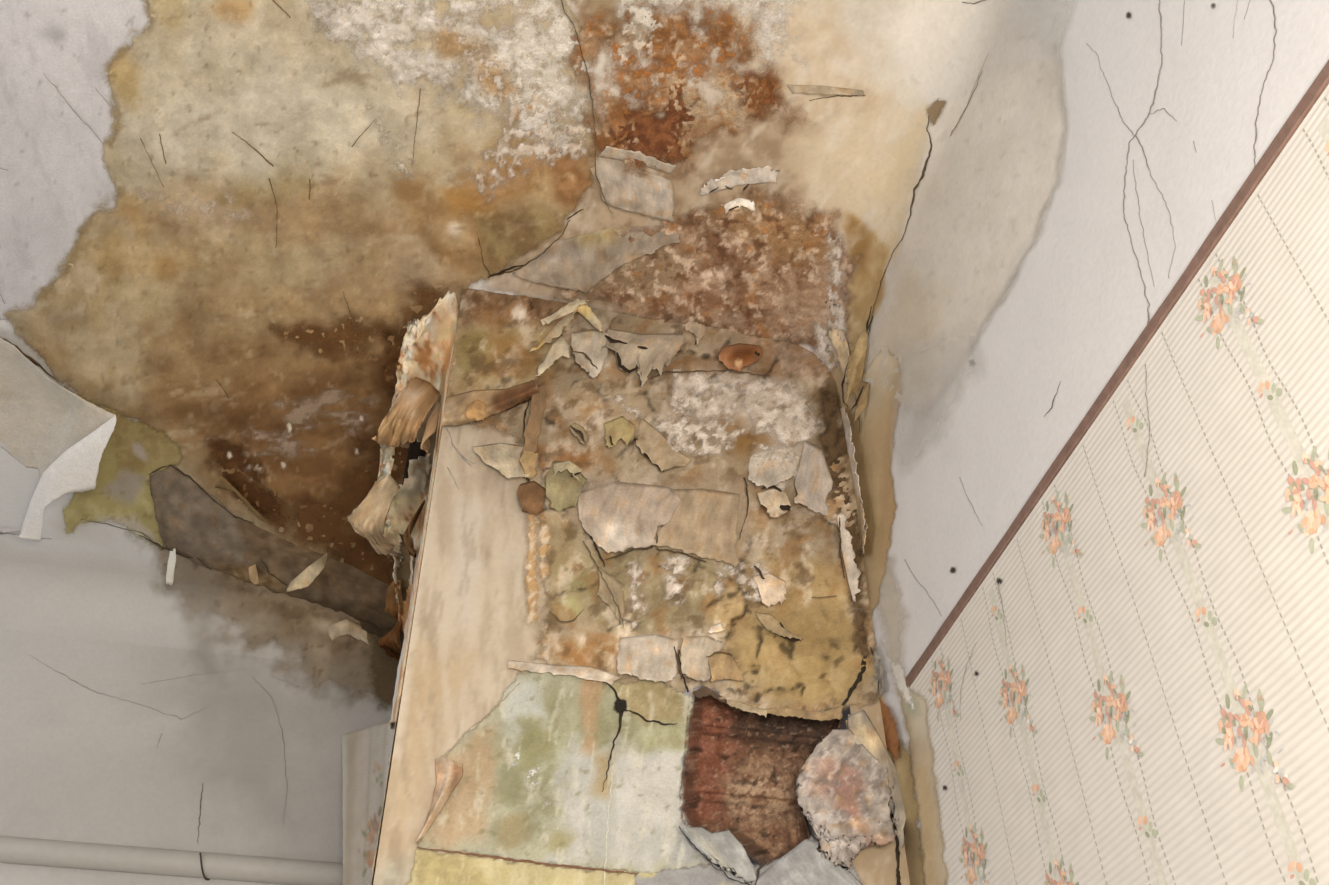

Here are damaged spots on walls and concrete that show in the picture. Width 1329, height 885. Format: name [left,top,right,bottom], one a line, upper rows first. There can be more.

peeling [0,337,116,542]
peeling [0,0,152,319]
leakage [152,538,413,885]
peeling [347,291,462,729]
leakage [4,0,1065,712]
crack [561,0,596,138]
peeling [478,146,780,387]
crack [602,682,677,791]
peeling [416,326,870,885]
rust [569,0,797,170]
crack [1086,0,1197,324]
crack [1233,0,1277,169]